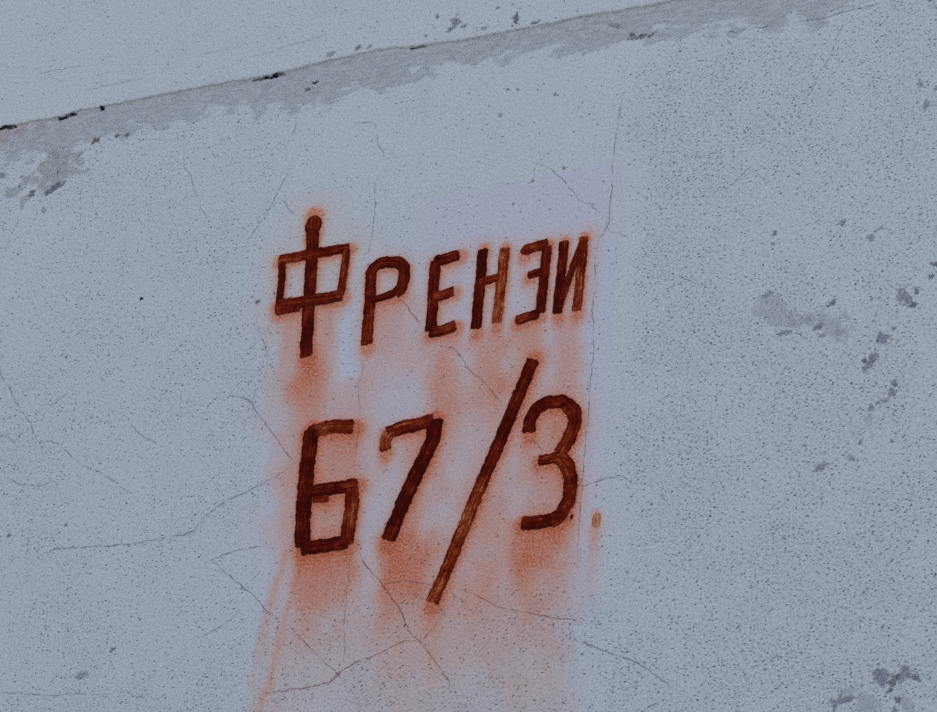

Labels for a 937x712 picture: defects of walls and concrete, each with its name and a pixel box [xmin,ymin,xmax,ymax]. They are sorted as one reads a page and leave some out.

spalling [0,0,849,178]
spalling [29,170,65,197]